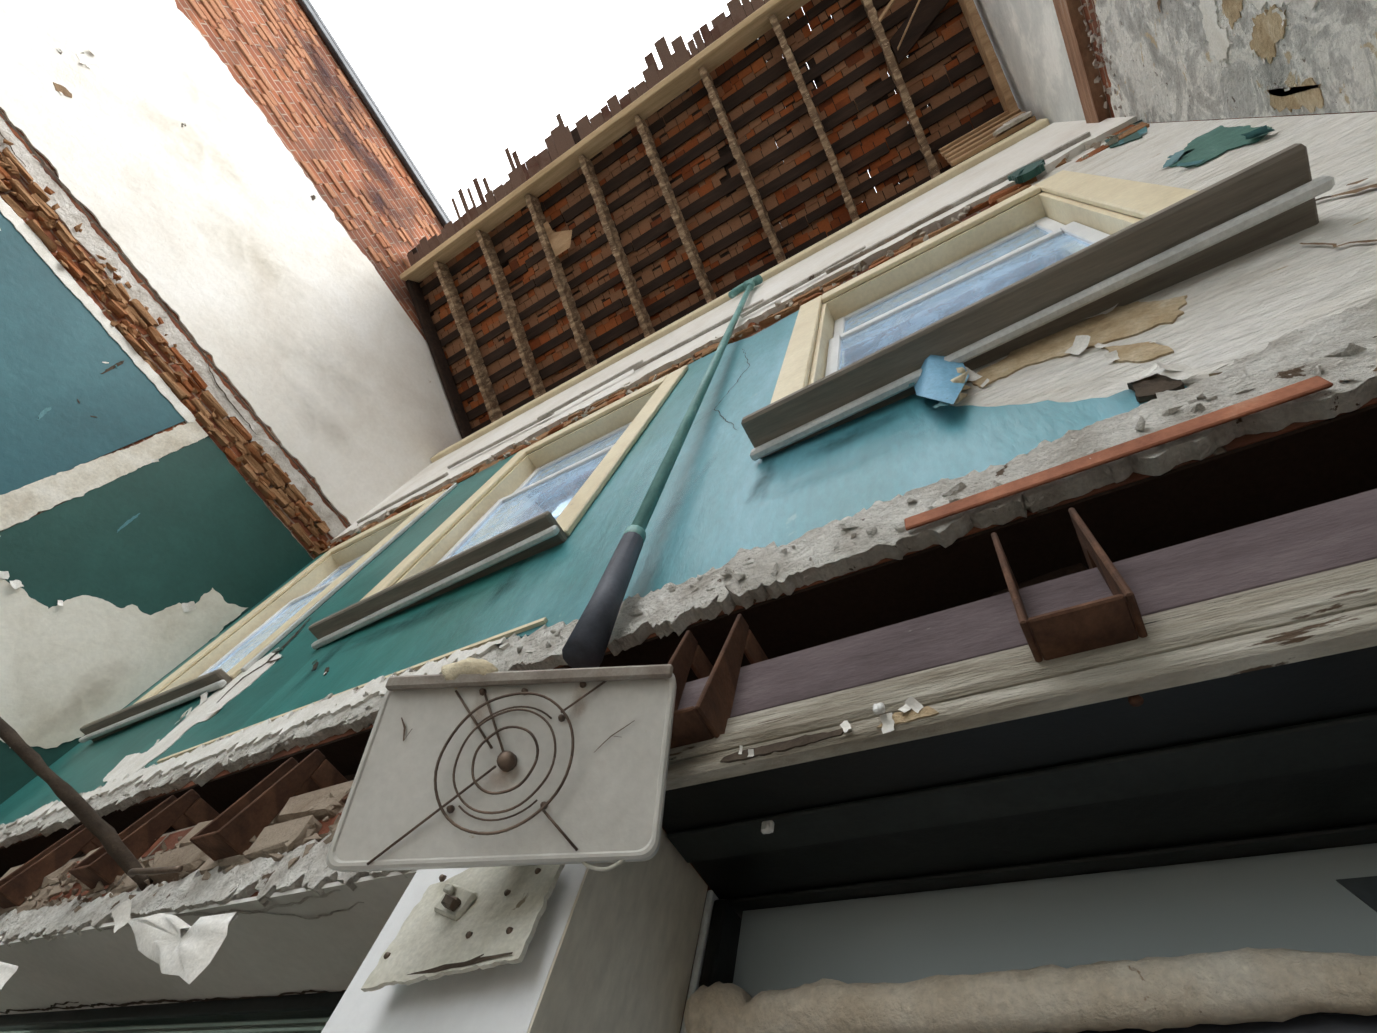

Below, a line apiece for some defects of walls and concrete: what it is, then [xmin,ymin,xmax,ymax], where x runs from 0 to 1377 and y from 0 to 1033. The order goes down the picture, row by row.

spalling [1199,0,1320,66]
spalling [53,82,72,98]
flaking render [823,77,1377,407]
peeling [0,421,208,537]
peeling [0,571,249,749]
peeling [0,961,18,990]
peeling [112,899,238,984]